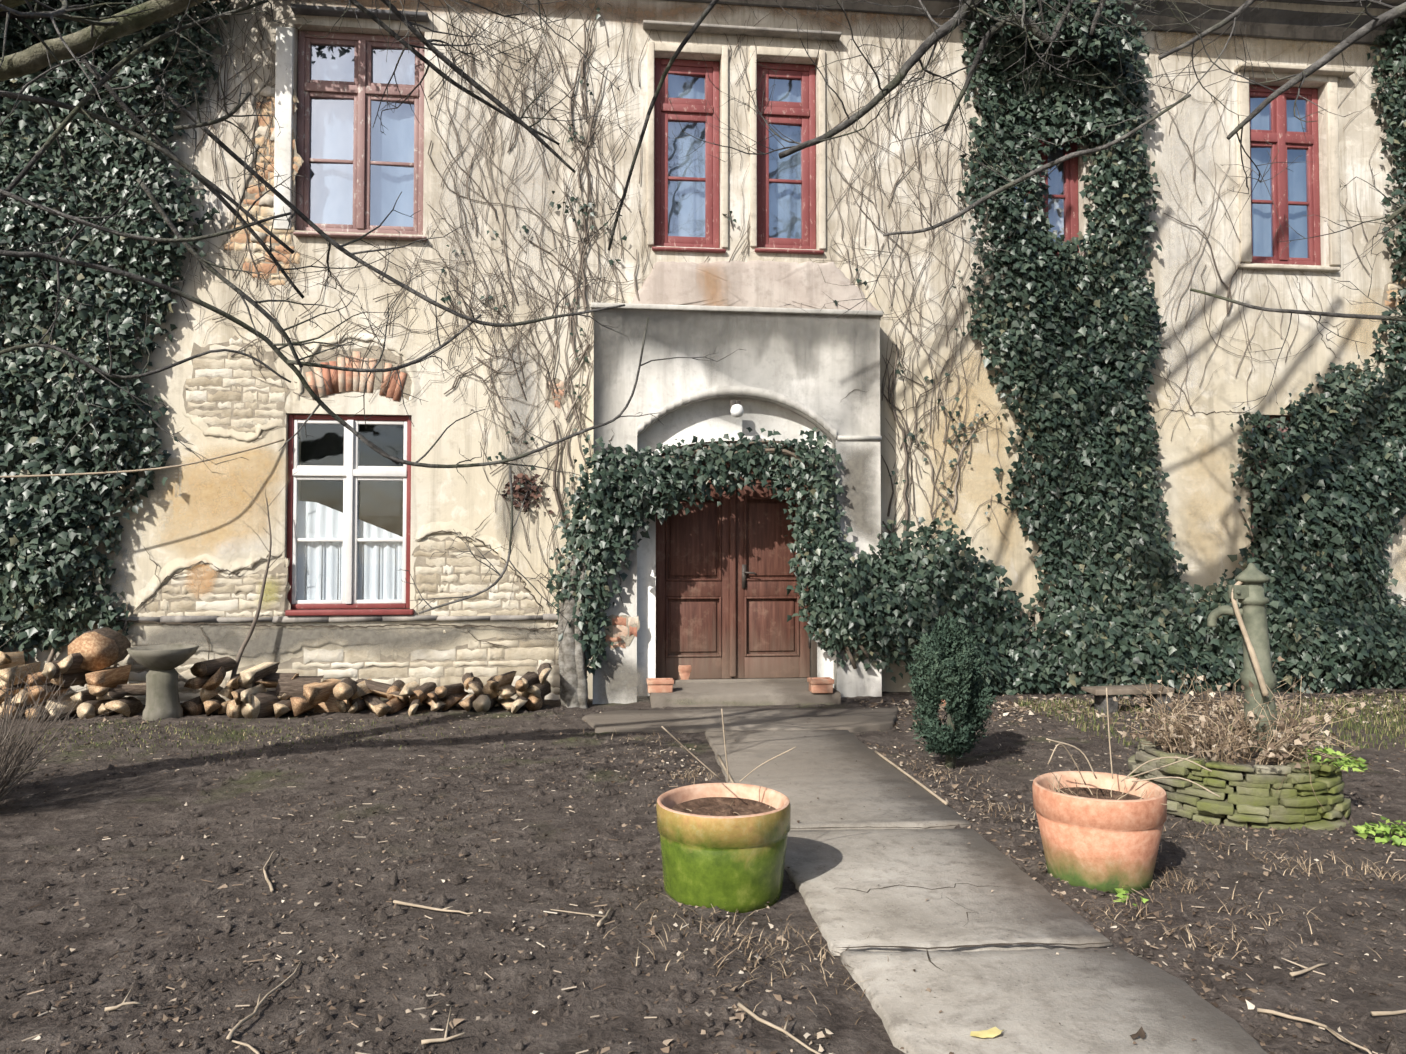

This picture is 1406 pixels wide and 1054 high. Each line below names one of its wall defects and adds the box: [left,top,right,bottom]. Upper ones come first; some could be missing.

flaking render [220,73,304,286]
spalling [182,331,421,443]
damp [169,451,274,546]
spalling [100,546,291,624]
spalling [267,520,560,700]
spalling [68,684,89,695]
spalling [111,637,151,705]
spalling [175,643,255,703]